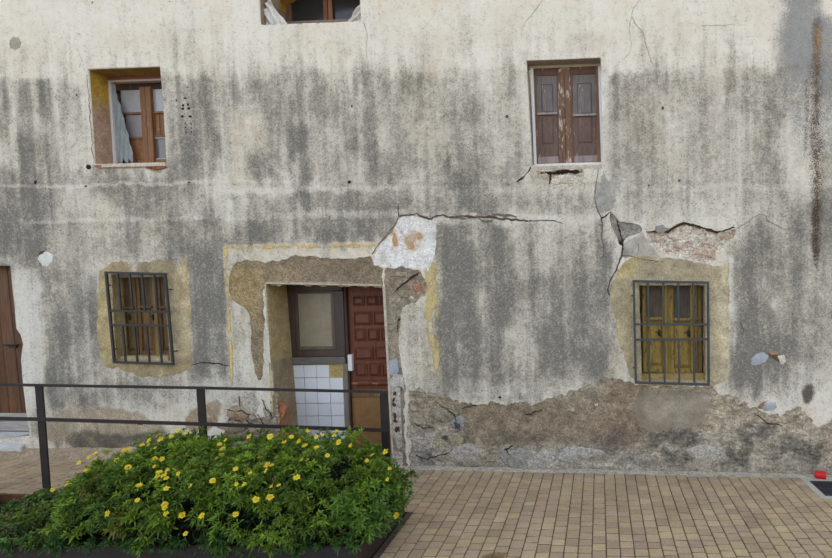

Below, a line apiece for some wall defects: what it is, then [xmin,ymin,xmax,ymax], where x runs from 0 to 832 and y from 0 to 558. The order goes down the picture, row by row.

crack [623,0,657,75]
water stain [779,0,832,155]
flaking render [537,169,584,189]
crack [372,205,563,254]
crack [595,169,662,295]
flaking render [224,212,832,475]
flaking render [186,390,280,453]